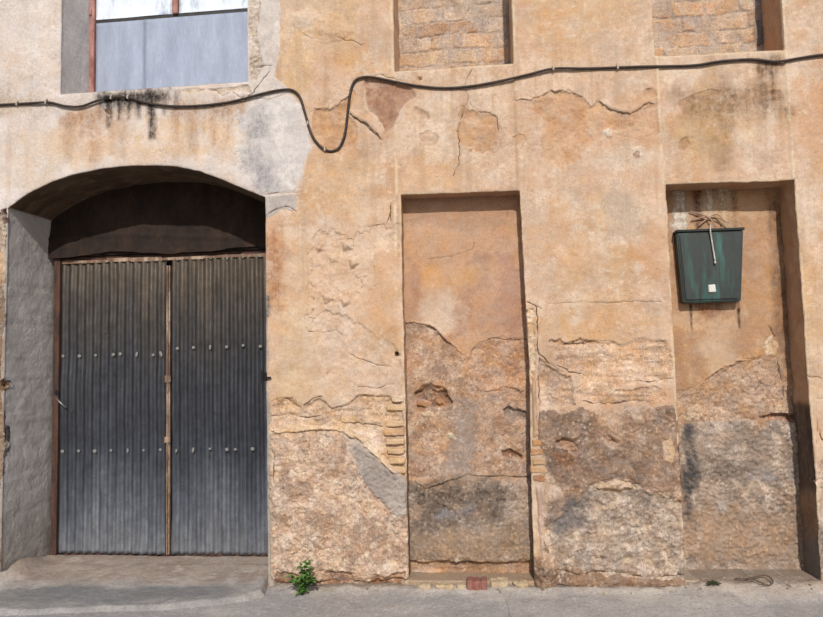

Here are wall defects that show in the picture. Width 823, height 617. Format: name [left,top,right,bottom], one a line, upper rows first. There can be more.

leakage [97,91,167,138]
flaking render [312,78,430,155]
flaking render [456,105,526,157]
peeling [514,85,660,170]
peeling [0,213,8,486]
peeling [271,223,674,482]
peeling [676,356,794,434]
peeling [544,480,688,588]